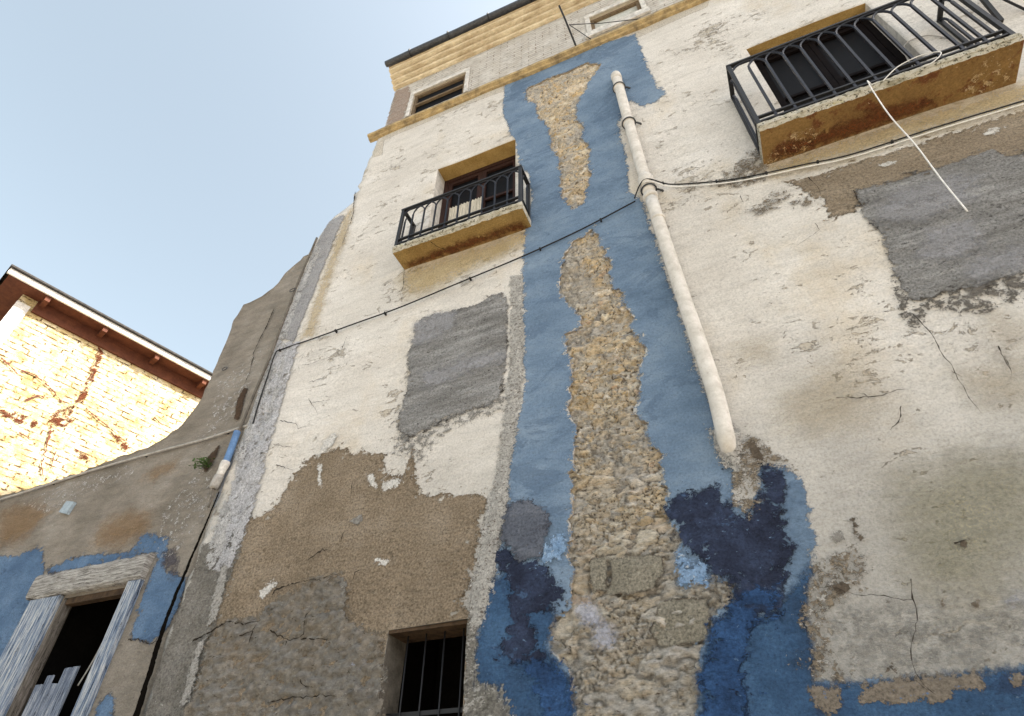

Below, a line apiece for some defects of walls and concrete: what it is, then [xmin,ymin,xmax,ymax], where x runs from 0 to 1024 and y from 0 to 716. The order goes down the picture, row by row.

spalling [526,64,599,209]
corrosion [773,99,937,161]
crack [911,314,980,411]
spalling [540,232,736,716]
crack [193,610,327,645]
peeling [179,433,492,716]
crack [810,579,936,695]
peeling [787,515,986,716]
peeling [1008,672,1024,687]